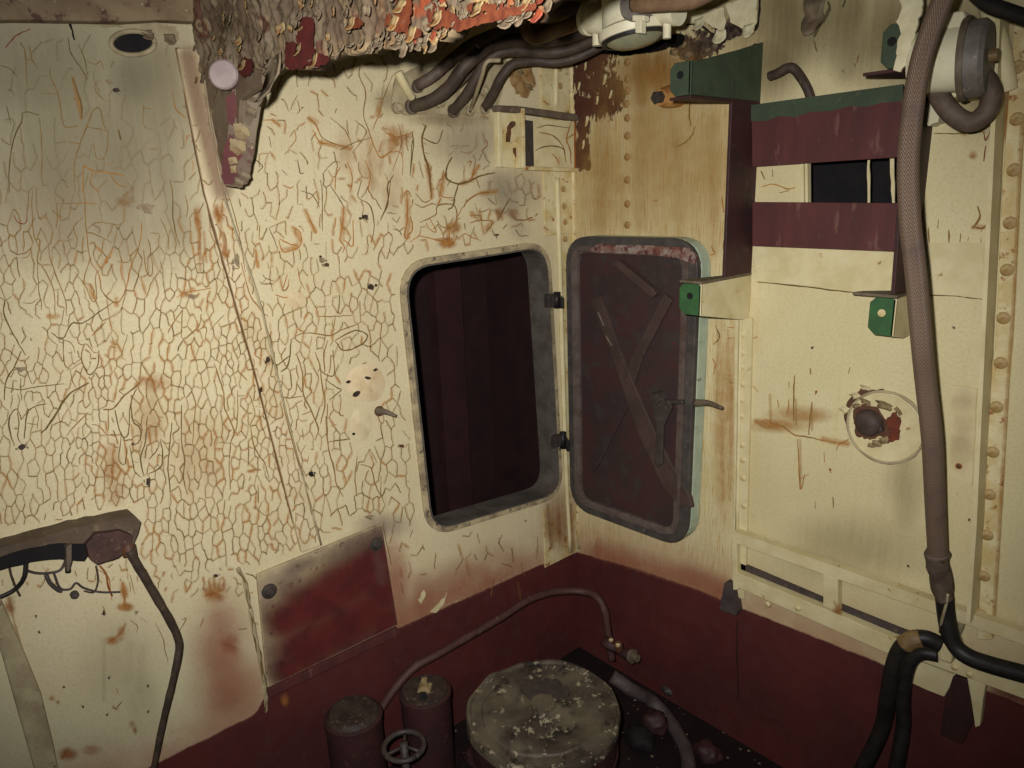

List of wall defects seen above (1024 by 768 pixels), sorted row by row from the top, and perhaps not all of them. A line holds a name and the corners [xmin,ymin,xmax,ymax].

peeling [211,0,553,103]
crack [227,66,533,316]
crack [535,121,575,165]
crack [0,24,196,495]
crack [168,288,224,340]
crack [214,312,413,565]
peeling [839,385,884,423]